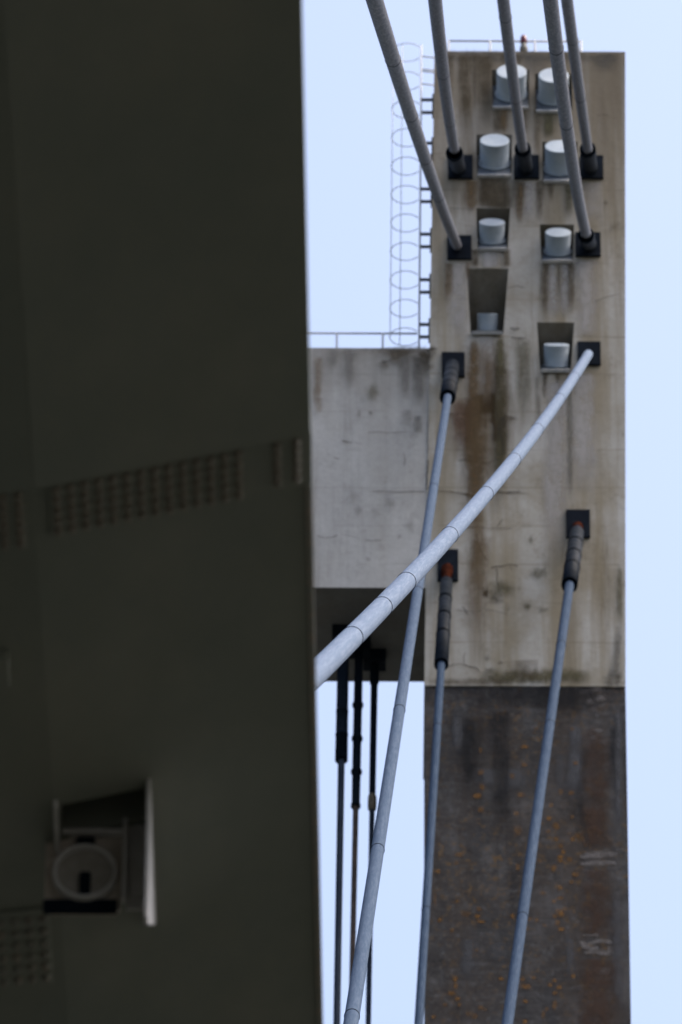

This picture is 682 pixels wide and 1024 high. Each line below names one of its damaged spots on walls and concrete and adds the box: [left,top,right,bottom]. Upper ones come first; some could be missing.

leakage [460,56,507,129]
leakage [481,338,515,470]
leakage [489,669,583,697]